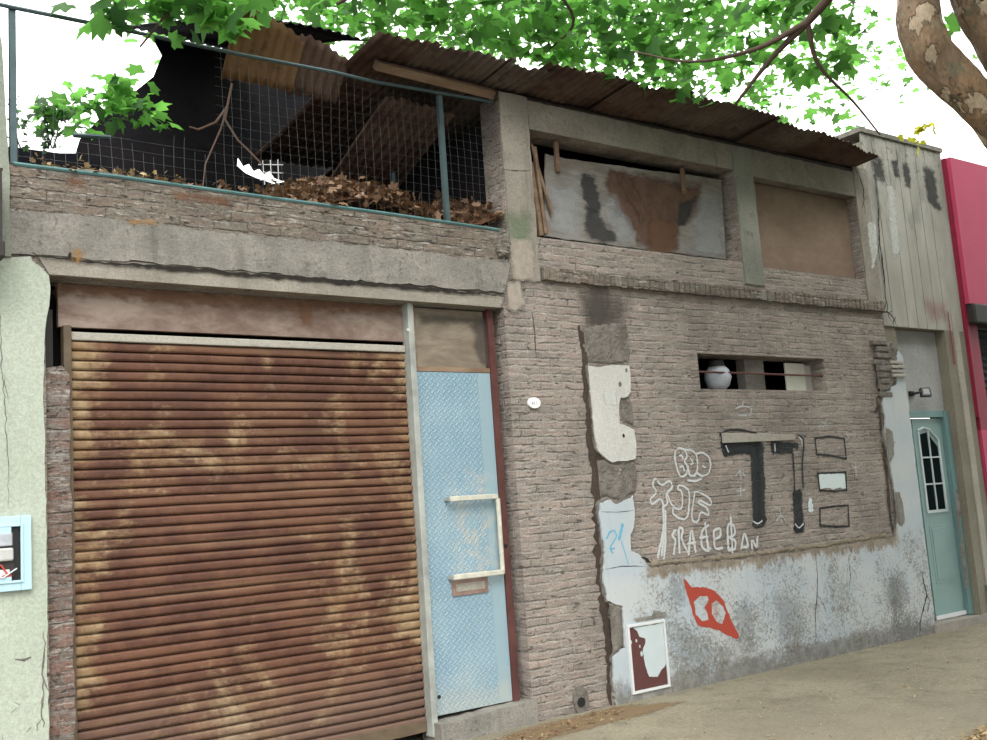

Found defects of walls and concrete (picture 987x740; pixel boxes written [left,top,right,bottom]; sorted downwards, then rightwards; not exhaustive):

crack [0,316,9,500]
flaking render [583,323,637,500]
crack [37,631,49,728]
peeling [609,603,666,677]
crack [920,572,930,636]